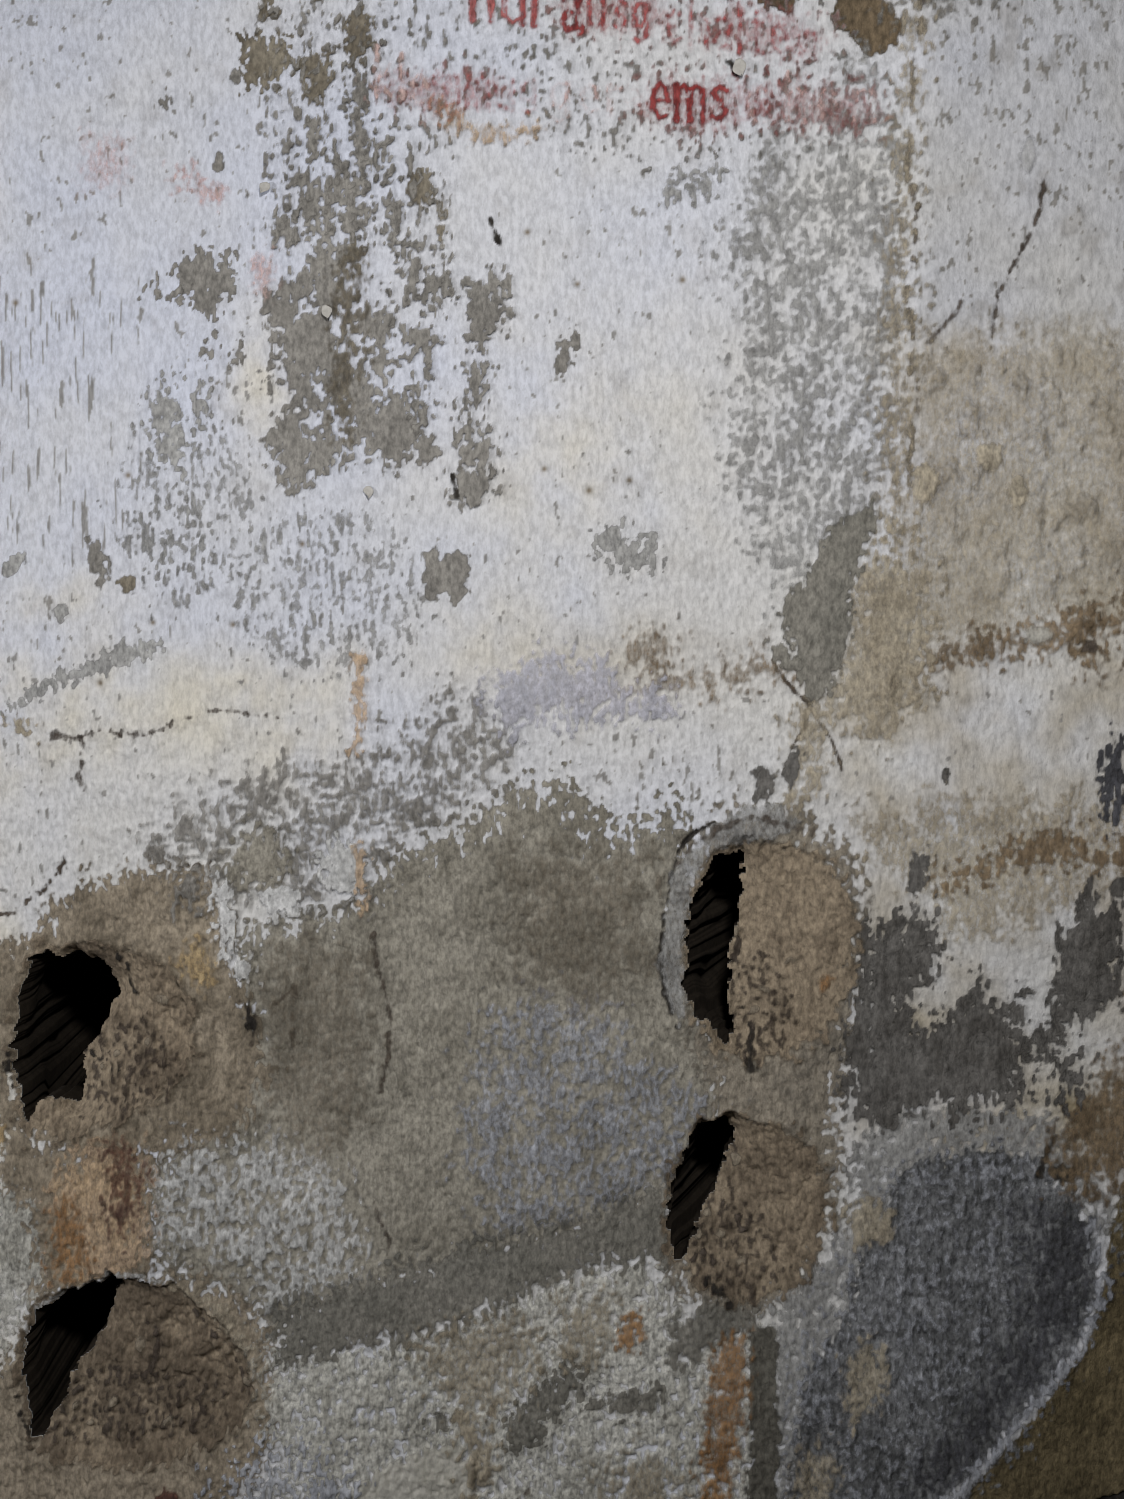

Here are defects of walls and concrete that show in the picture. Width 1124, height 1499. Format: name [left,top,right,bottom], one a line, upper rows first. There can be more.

peeling [84,0,1009,702]
spalling [1082,640,1098,653]
crack [31,708,279,785]
peeling [0,672,1124,1499]
crack [1100,1491,1124,1499]